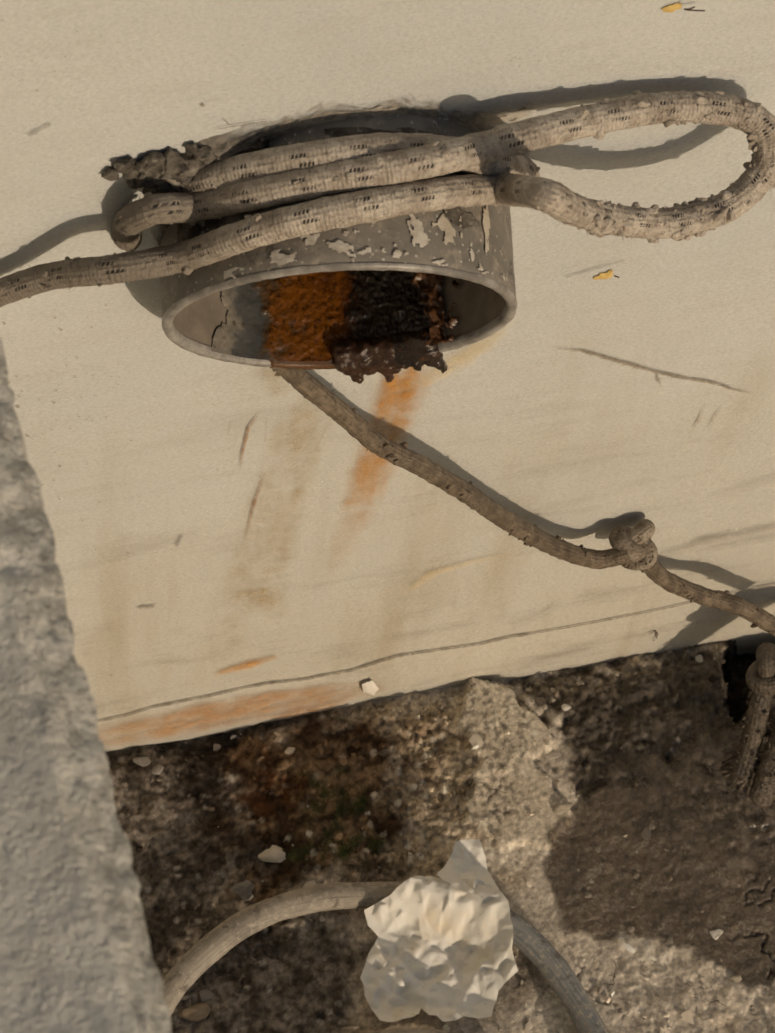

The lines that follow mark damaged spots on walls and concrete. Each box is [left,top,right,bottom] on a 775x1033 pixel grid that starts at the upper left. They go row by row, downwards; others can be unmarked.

peeling [223,267,245,279]
peeling [270,205,490,274]
rust [254,270,371,361]